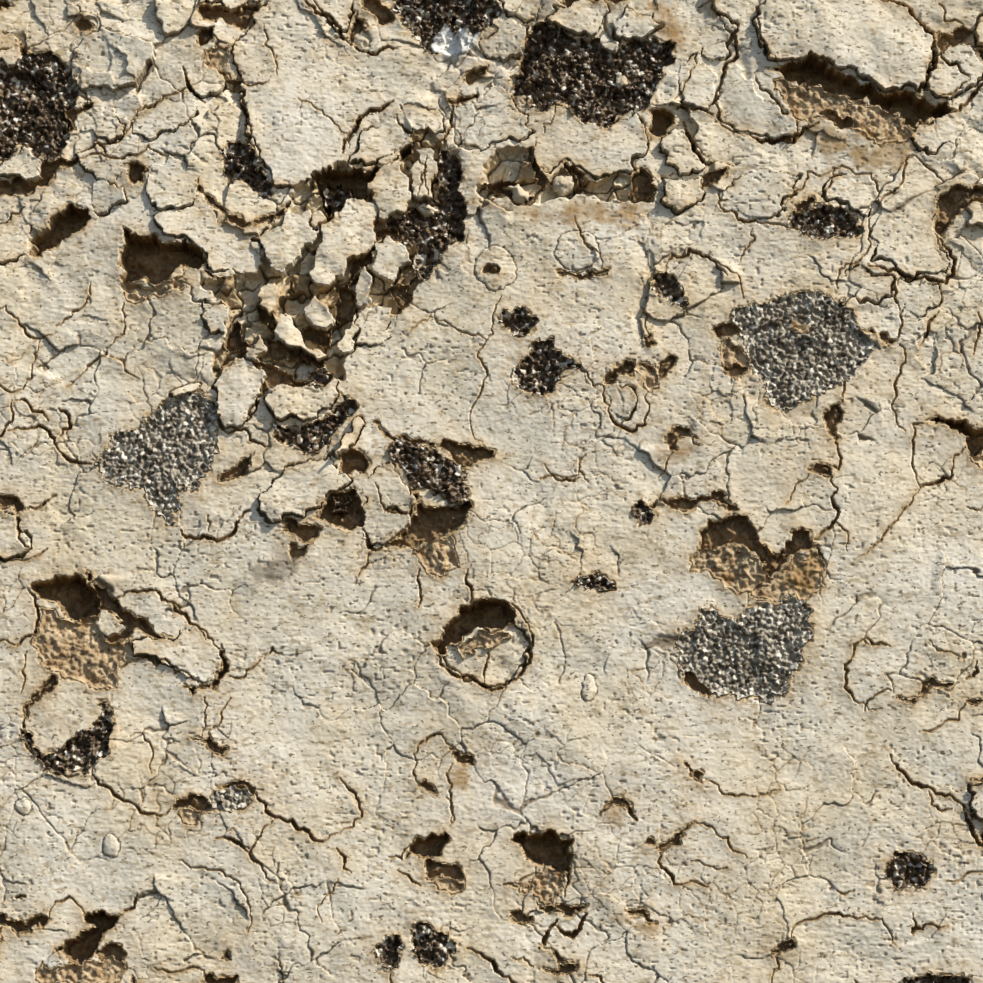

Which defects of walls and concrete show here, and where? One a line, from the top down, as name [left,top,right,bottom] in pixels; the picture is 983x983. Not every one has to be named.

crack [674,1,820,167]
crack [888,0,983,114]
crack [0,284,140,465]
peeling [0,0,983,581]
crack [665,155,966,561]
spalling [20,569,230,777]
spalling [430,596,530,687]
spalling [630,490,829,707]
spalling [0,912,53,955]
crack [179,778,364,933]
crack [467,850,588,983]
crack [890,754,983,883]